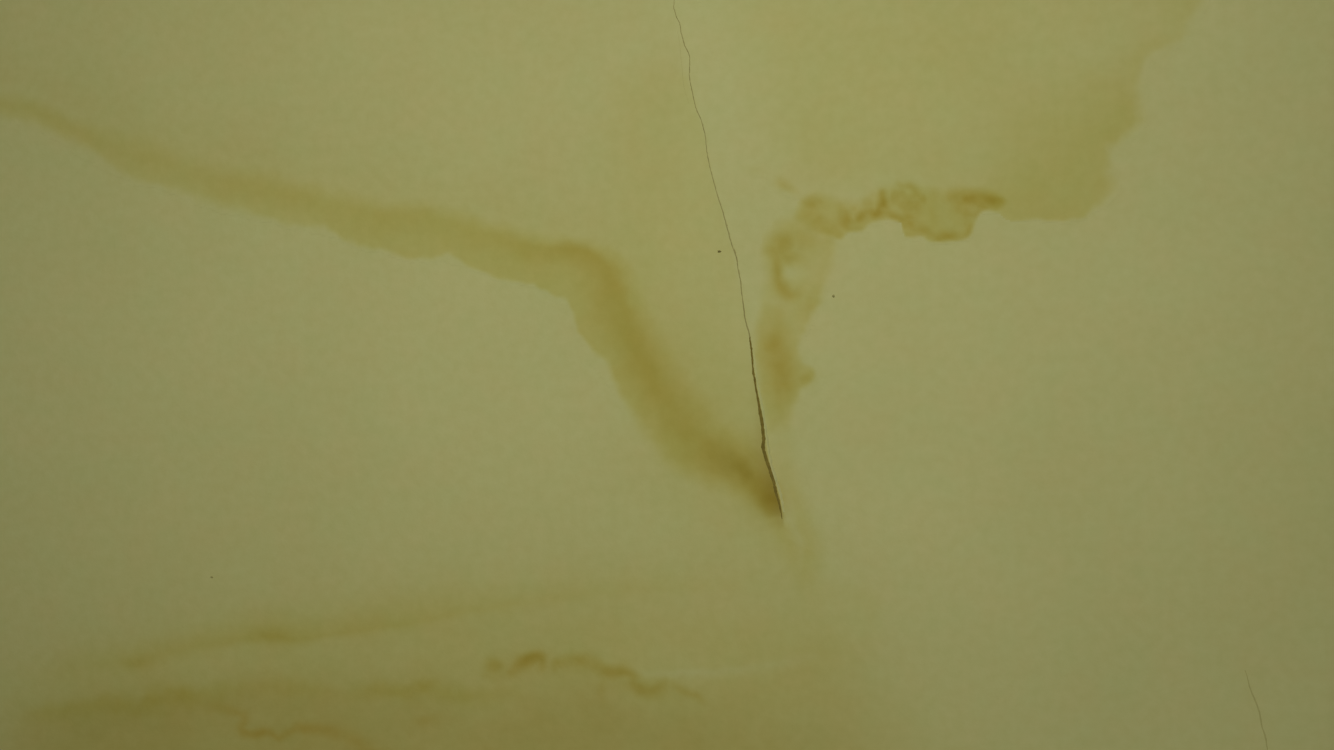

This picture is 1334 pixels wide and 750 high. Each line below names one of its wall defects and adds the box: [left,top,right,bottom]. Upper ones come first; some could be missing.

leakage [0,0,791,574]
crack [673,5,785,518]
leakage [698,0,1209,436]
leakage [0,407,1083,750]